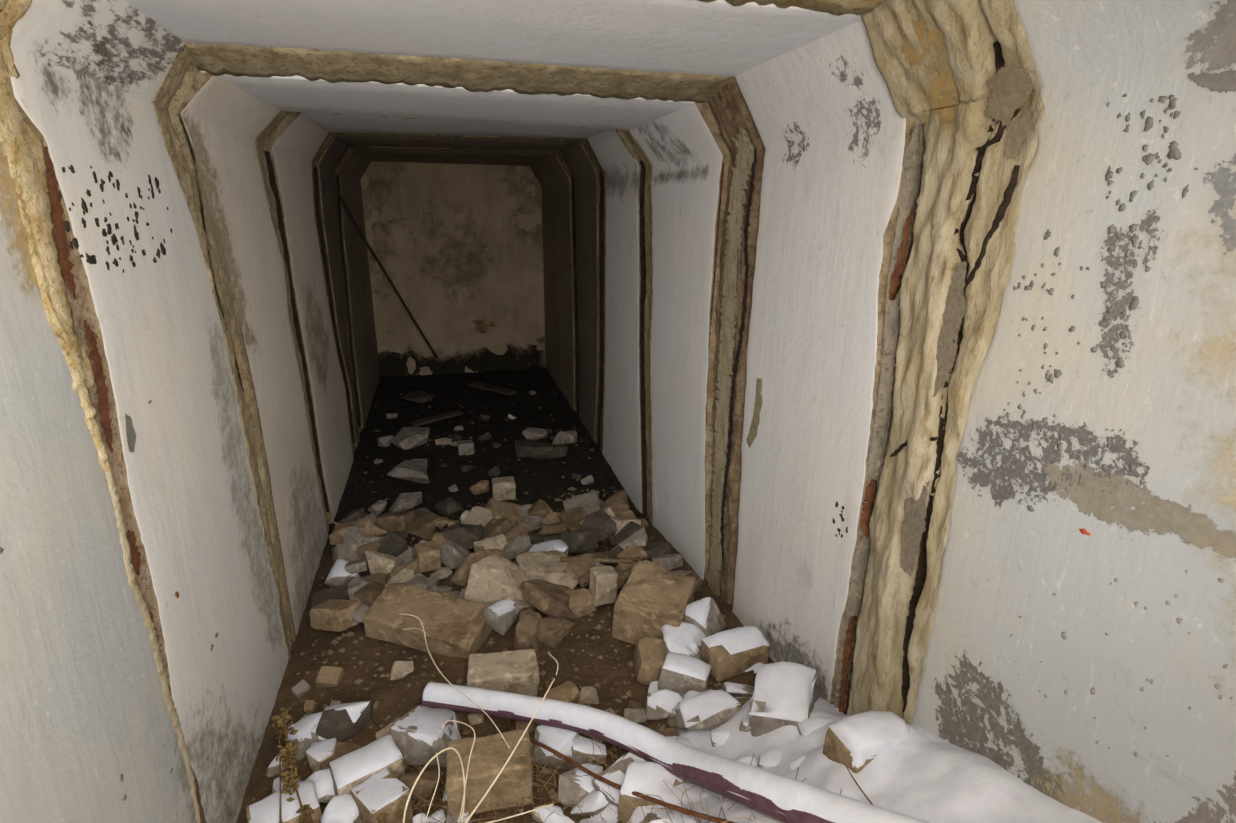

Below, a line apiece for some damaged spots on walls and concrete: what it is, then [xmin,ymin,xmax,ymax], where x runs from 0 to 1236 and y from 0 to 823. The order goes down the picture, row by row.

damp [42,67,64,97]
corrosion [44,146,77,299]
damp [58,62,172,273]
peeling [832,56,881,167]
peeling [1013,229,1061,295]
peeling [1068,93,1182,379]
peeling [1185,0,1236,93]
peeling [1194,153,1236,255]
corrosion [84,319,113,452]
crack [889,41,1022,712]
peeling [955,317,1236,557]
peeling [1175,771,1236,823]